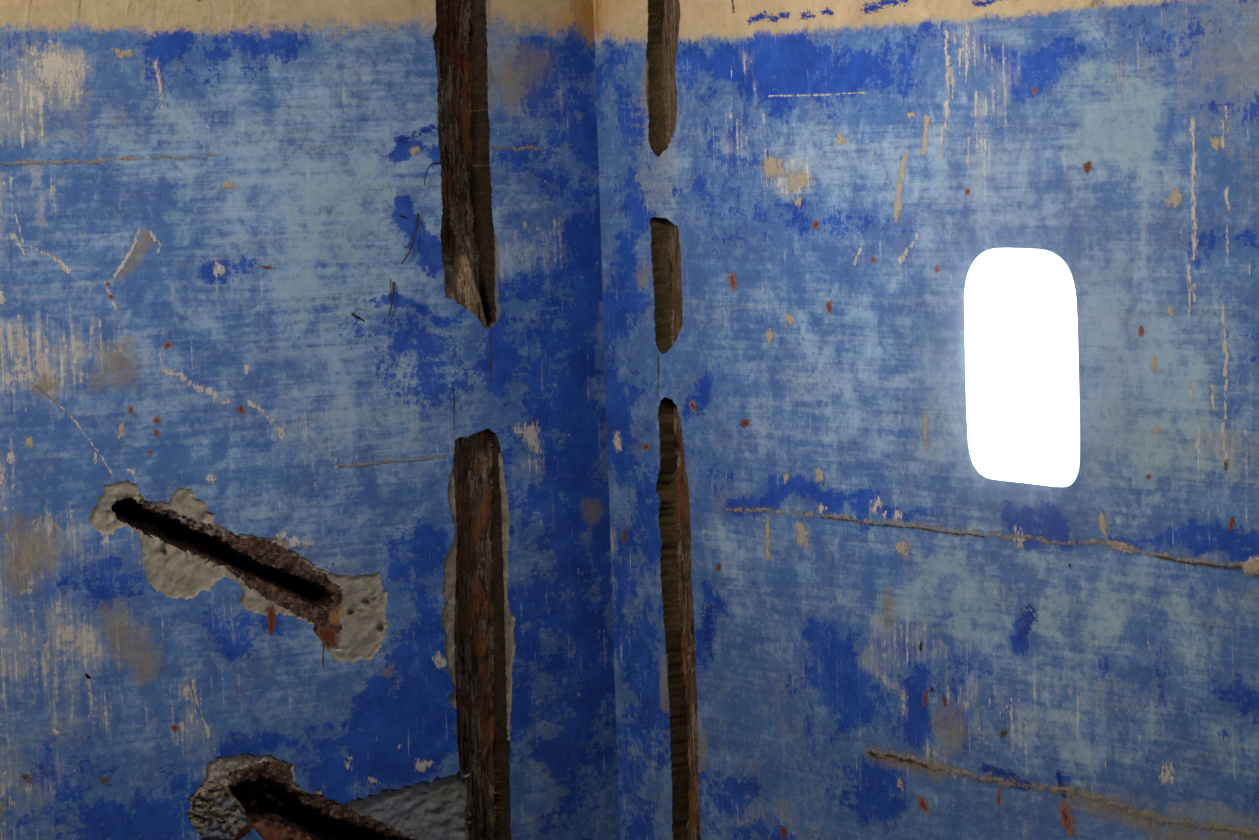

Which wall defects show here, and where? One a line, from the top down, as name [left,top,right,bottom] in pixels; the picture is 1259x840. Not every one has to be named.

spalling [88,467,388,668]
spalling [186,468,471,840]
crack [725,506,1259,572]